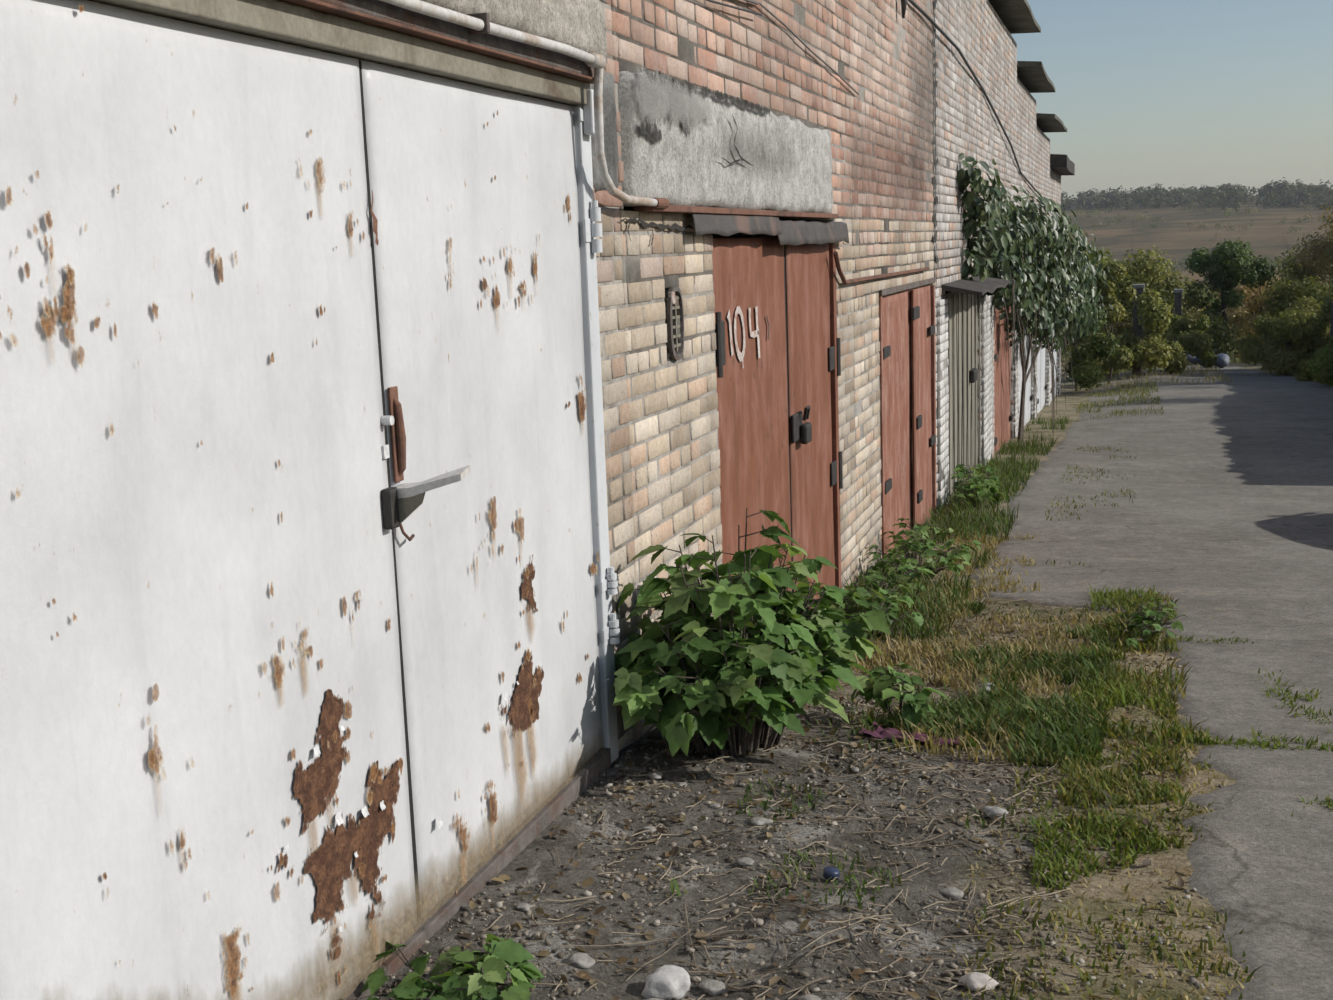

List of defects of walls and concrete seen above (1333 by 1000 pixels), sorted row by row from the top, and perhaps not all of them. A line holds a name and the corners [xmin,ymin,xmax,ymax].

rust [300,158,325,218]
rust [348,190,379,245]
rust [33,211,85,366]
rust [210,247,237,283]
rust [480,235,540,308]
rust [471,496,504,572]
rust [514,509,538,629]
rust [262,623,323,695]
rust [147,718,165,778]
rust [485,641,544,798]
rust [270,688,403,986]
rust [223,928,253,1000]